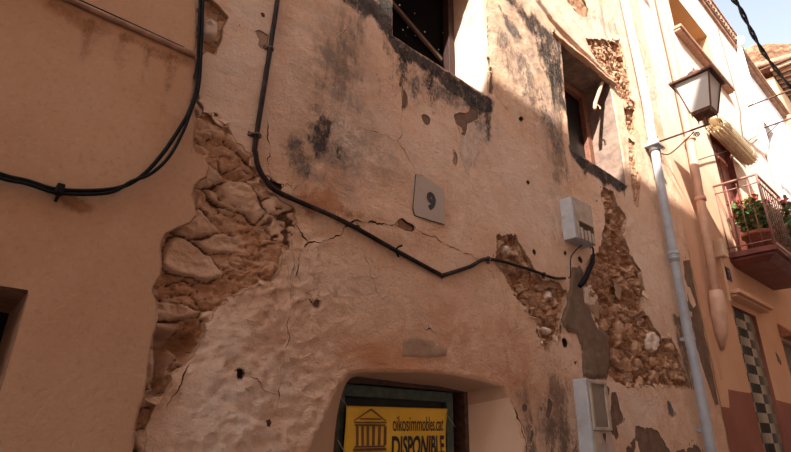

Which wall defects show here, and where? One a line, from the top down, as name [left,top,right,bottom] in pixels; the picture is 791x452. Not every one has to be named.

leakage [286,114,331,180]
leakage [325,0,493,171]
peeling [454,107,478,136]
leakage [489,0,567,182]
spalling [585,37,641,207]
crack [166,361,190,410]
spalling [133,65,298,452]
crack [245,218,396,416]
spalling [493,233,567,353]
spalling [582,186,691,440]
peeling [626,426,703,452]